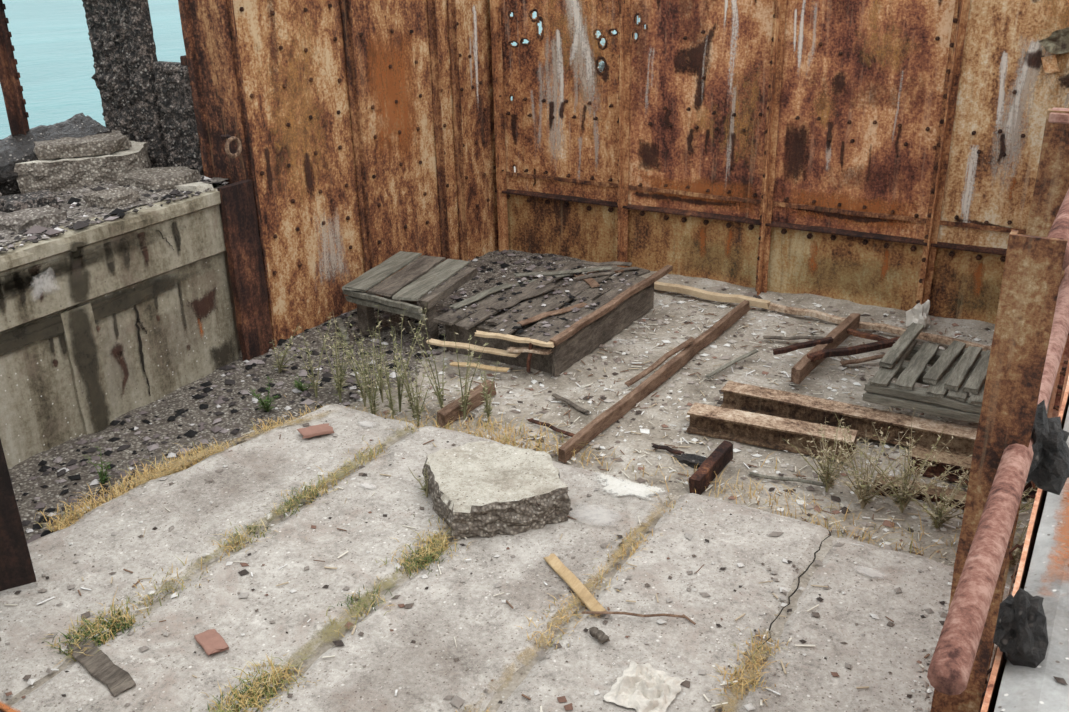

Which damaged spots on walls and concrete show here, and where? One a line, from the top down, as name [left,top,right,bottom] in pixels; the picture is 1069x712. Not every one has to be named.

damp [544,0,594,155]
corrosion [539,0,609,136]
corrosion [674,0,717,156]
damp [724,0,739,90]
corrosion [1024,0,1069,86]
peeling [1041,54,1060,73]
corrosion [634,140,753,211]
corrosion [784,125,908,229]
damp [172,222,181,253]
damp [0,232,187,432]
corrosion [188,287,217,334]
crack [756,530,831,652]